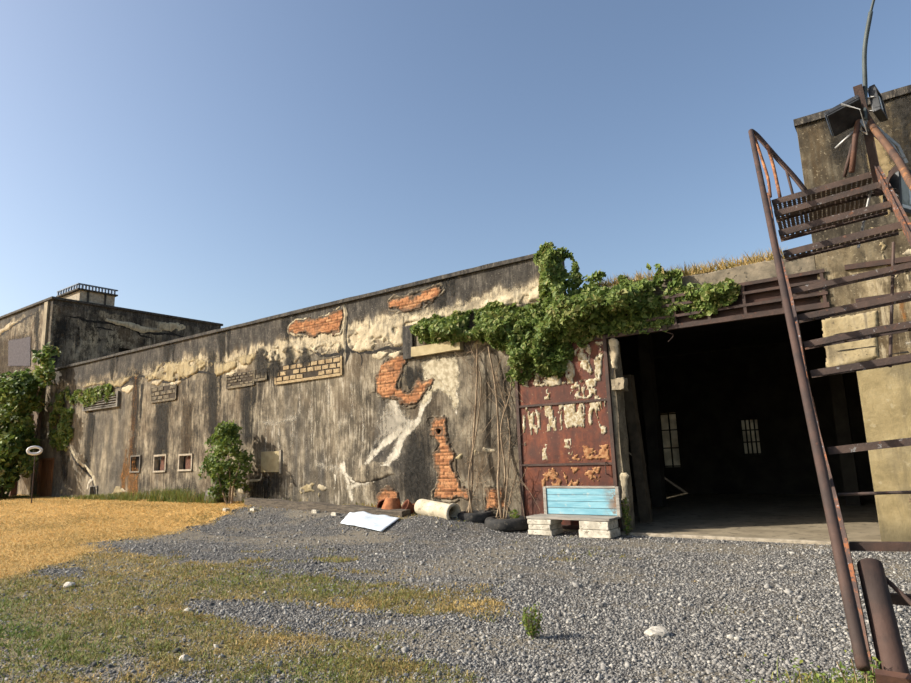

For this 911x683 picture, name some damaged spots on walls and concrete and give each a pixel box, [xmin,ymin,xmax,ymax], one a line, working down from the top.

water stain [824,118,893,198]
water stain [83,410,95,473]
water stain [129,371,143,459]
water stain [154,401,171,464]
water stain [204,330,230,436]
water stain [241,386,256,443]
water stain [255,314,309,385]
flaking render [83,283,540,410]
water stain [317,462,374,501]
water stain [365,356,459,503]
flaking render [426,413,495,504]
peeling [523,338,628,489]